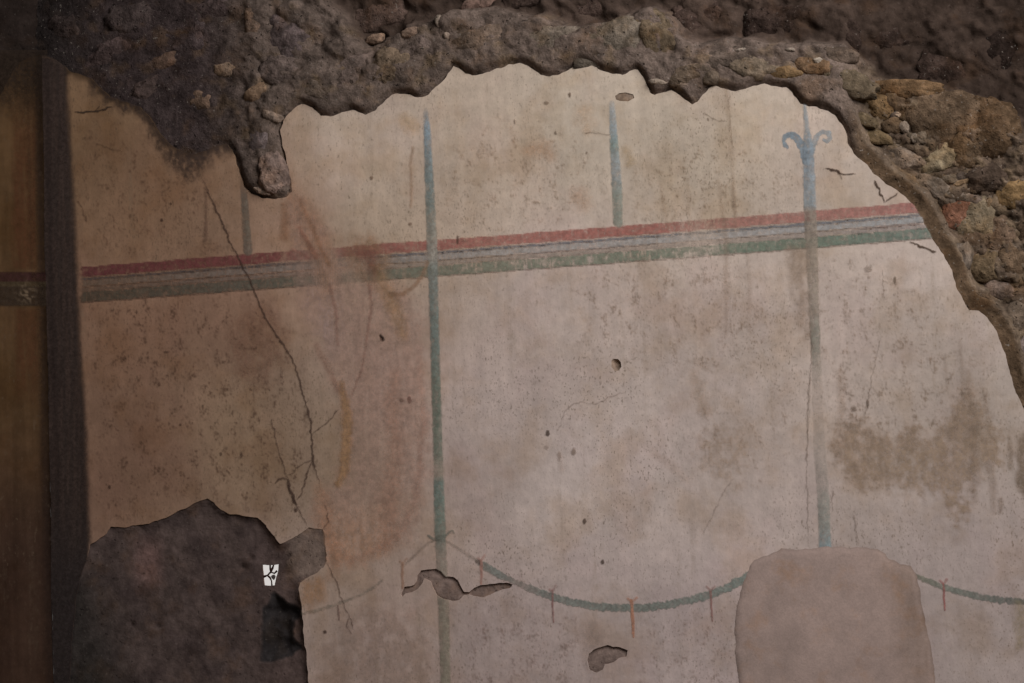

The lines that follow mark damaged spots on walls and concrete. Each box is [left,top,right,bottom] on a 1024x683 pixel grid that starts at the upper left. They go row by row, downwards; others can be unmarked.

spalling [35,0,1024,408]
crack [207,192,328,520]
leakage [832,388,1001,512]
spalling [70,499,327,683]
spalling [401,569,513,601]
spalling [587,645,628,673]